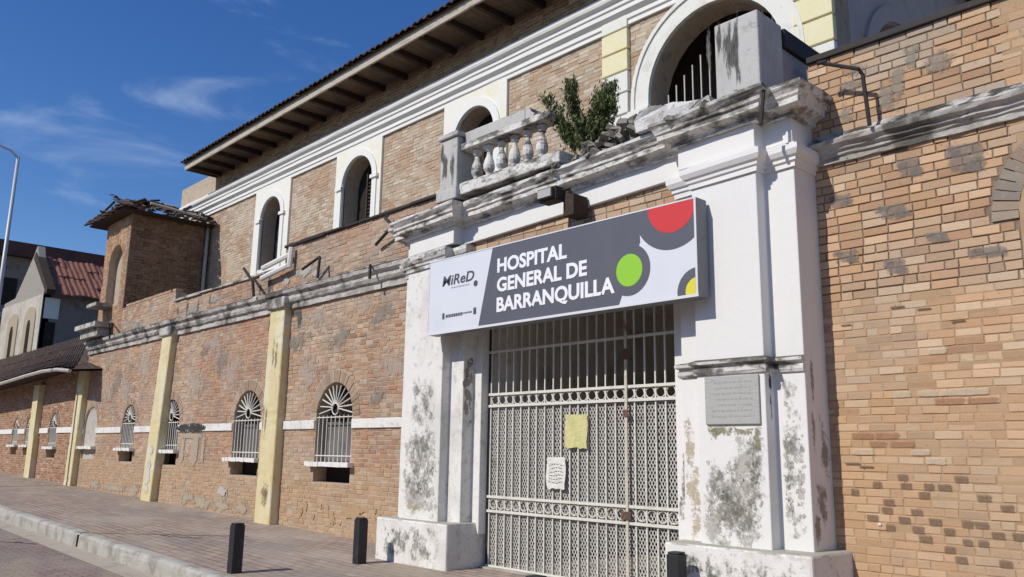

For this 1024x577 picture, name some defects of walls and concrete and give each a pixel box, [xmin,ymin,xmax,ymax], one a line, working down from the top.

water stain [706,22,741,85]
spalling [607,119,638,145]
water stain [406,438,432,509]
water stain [685,420,752,535]
mould [783,437,801,488]